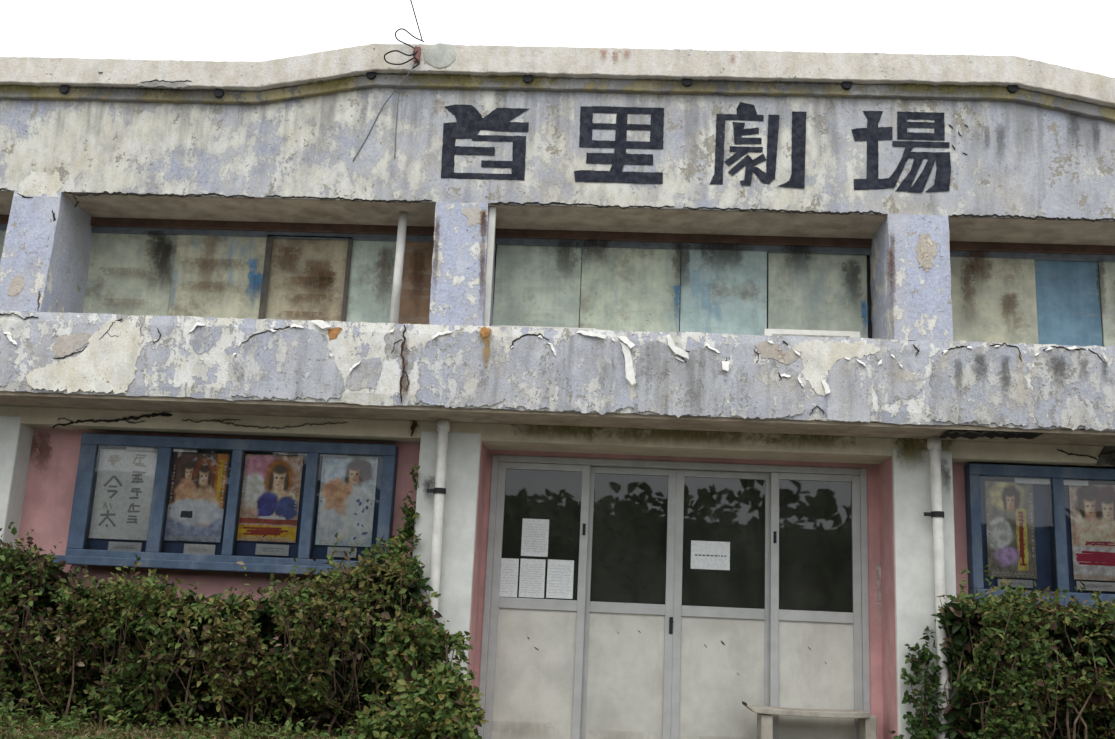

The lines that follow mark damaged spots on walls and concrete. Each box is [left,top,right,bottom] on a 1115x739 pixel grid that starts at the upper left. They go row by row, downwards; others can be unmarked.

peeling [915,233,937,272]
peeling [0,319,144,395]
peeling [189,322,214,354]
peeling [228,320,402,402]
crack [391,324,419,436]
rust [480,326,492,357]
peeling [414,330,1115,431]
crack [913,343,1104,362]
crack [51,412,348,429]
spalling [1096,446,1115,467]